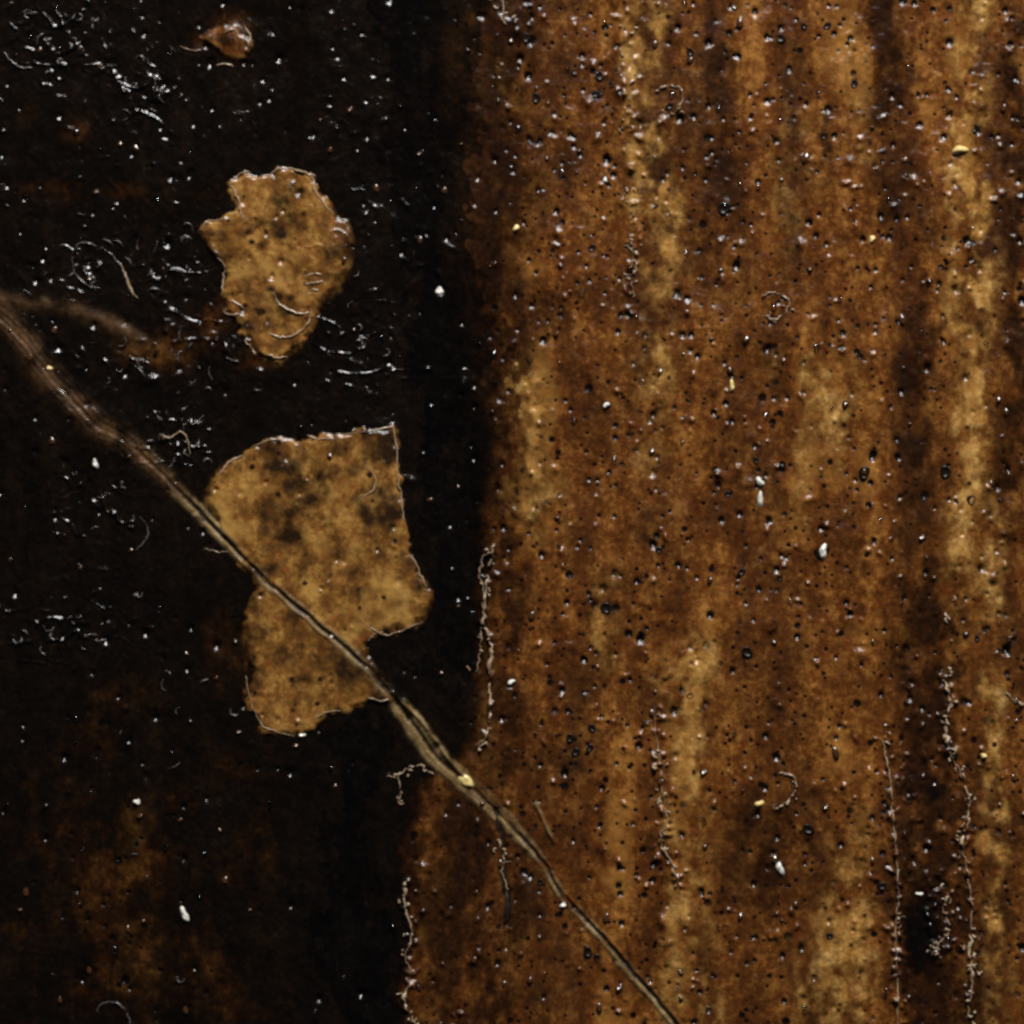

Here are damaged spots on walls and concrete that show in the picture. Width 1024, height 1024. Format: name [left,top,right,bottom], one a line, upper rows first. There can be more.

rust [621,0,668,80]
peeling [198,167,354,365]
rust [625,124,685,302]
rust [945,73,993,240]
crack [0,294,244,561]
rust [513,371,549,519]
rust [943,261,1006,613]
peeling [205,423,433,736]
crack [259,579,677,1024]
rust [670,637,722,805]
rust [795,894,876,1024]
rust [976,831,1009,1001]